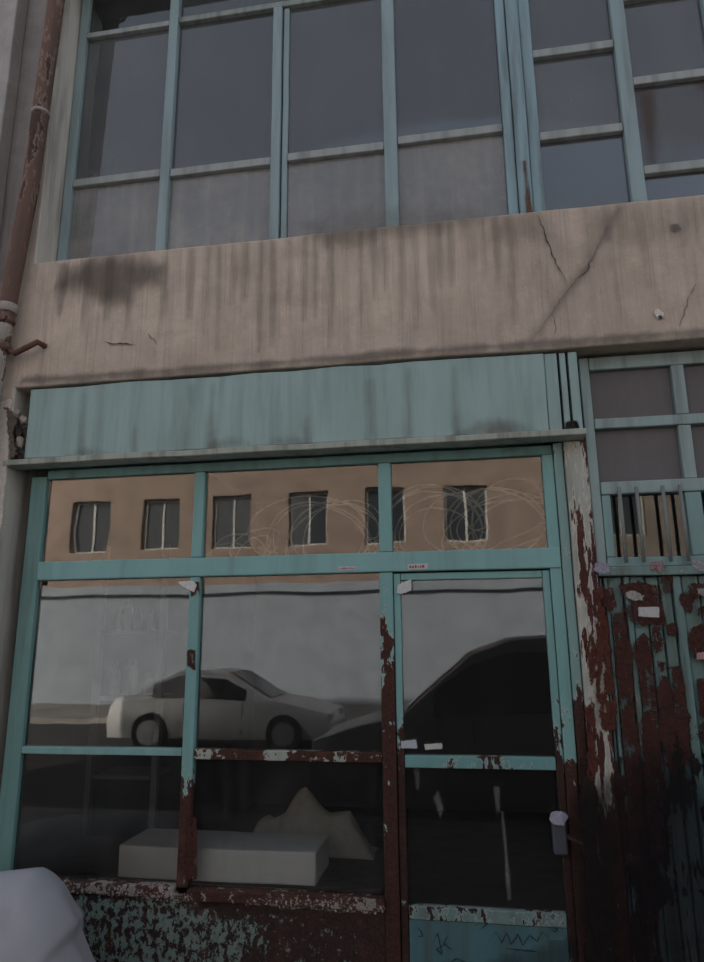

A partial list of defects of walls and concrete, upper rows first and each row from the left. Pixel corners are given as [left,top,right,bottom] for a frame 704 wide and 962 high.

crack [531,208,619,340]
spalling [0,398,28,529]